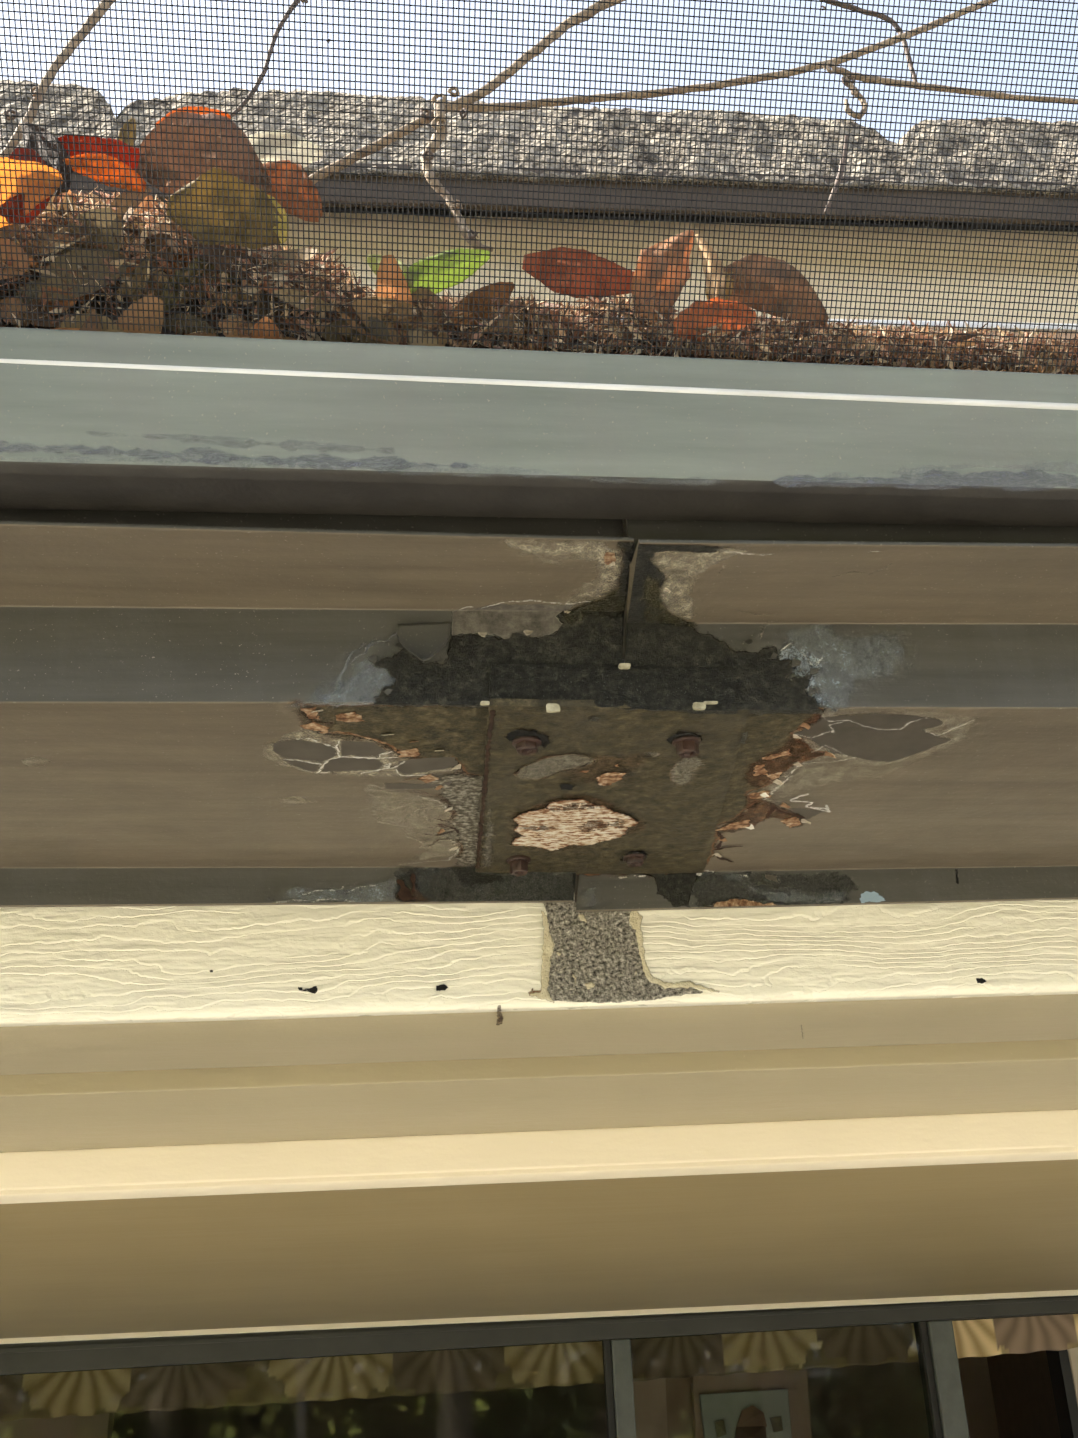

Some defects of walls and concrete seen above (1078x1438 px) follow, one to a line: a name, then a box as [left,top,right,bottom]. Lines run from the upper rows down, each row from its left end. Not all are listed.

peeling [367,542,973,763]
peeling [266,730,458,789]
corrosion [291,702,496,868]
corrosion [510,753,642,849]
peeling [505,729,648,861]
peeling [644,731,706,785]
corrosion [707,707,835,864]
peeling [783,794,831,820]
peeling [860,891,886,903]